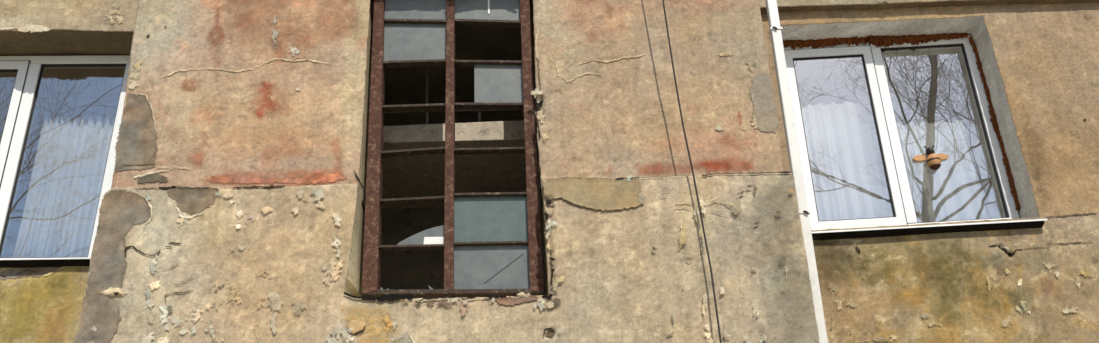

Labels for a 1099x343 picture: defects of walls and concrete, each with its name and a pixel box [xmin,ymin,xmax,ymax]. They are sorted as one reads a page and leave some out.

peeling [122,164,273,229]
peeling [292,188,343,284]
peeling [326,307,415,343]